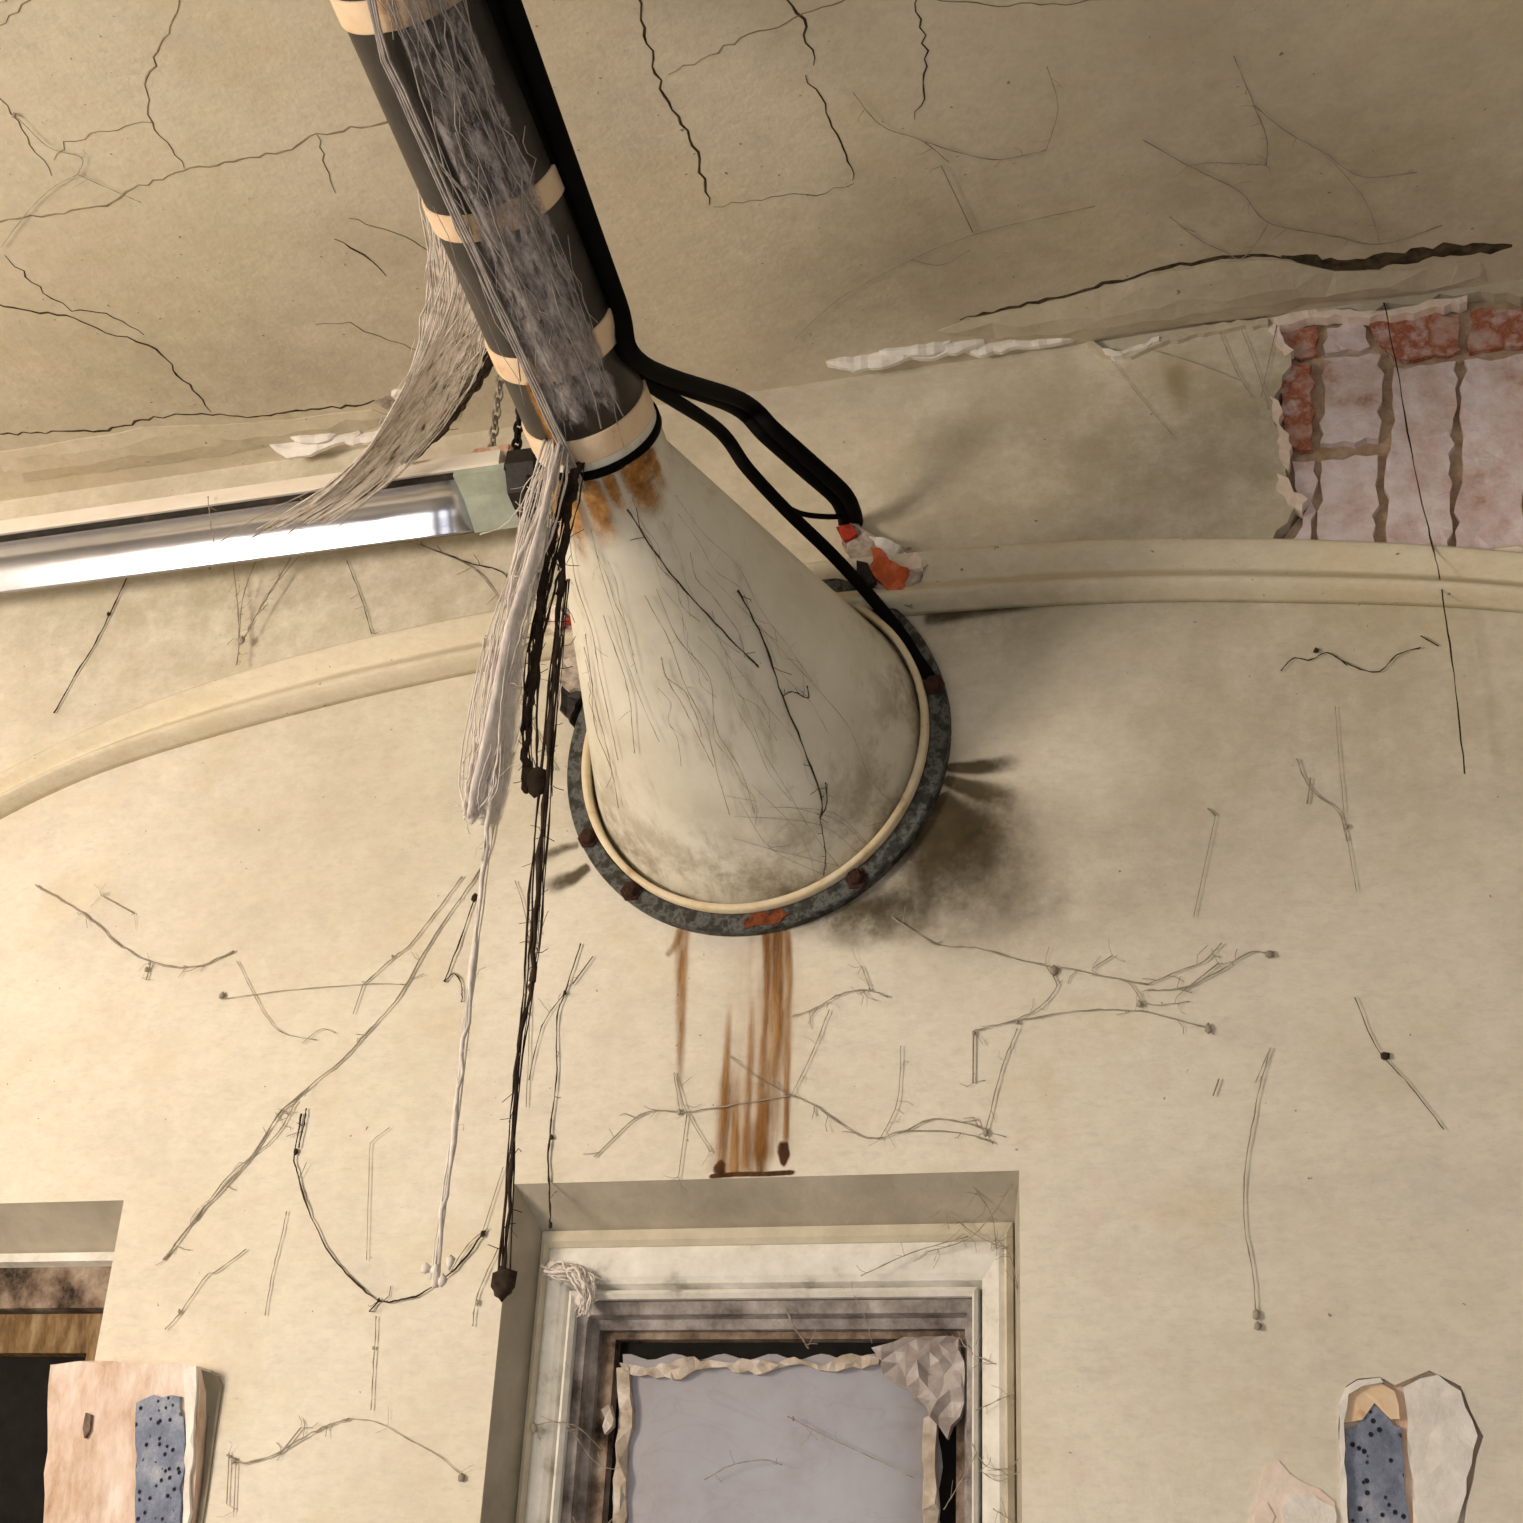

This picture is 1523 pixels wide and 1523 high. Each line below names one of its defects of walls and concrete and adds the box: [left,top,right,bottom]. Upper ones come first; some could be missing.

crack [960,242,1512,320]
spalling [826,295,1523,552]
spalling [836,523,928,609]
spalling [543,603,583,727]
leakage [902,776,1003,887]
leakage [832,893,913,934]
corrosion [673,932,686,1058]
corrosion [709,908,794,1178]
spalling [43,1361,223,1523]
spalling [1250,1372,1483,1523]